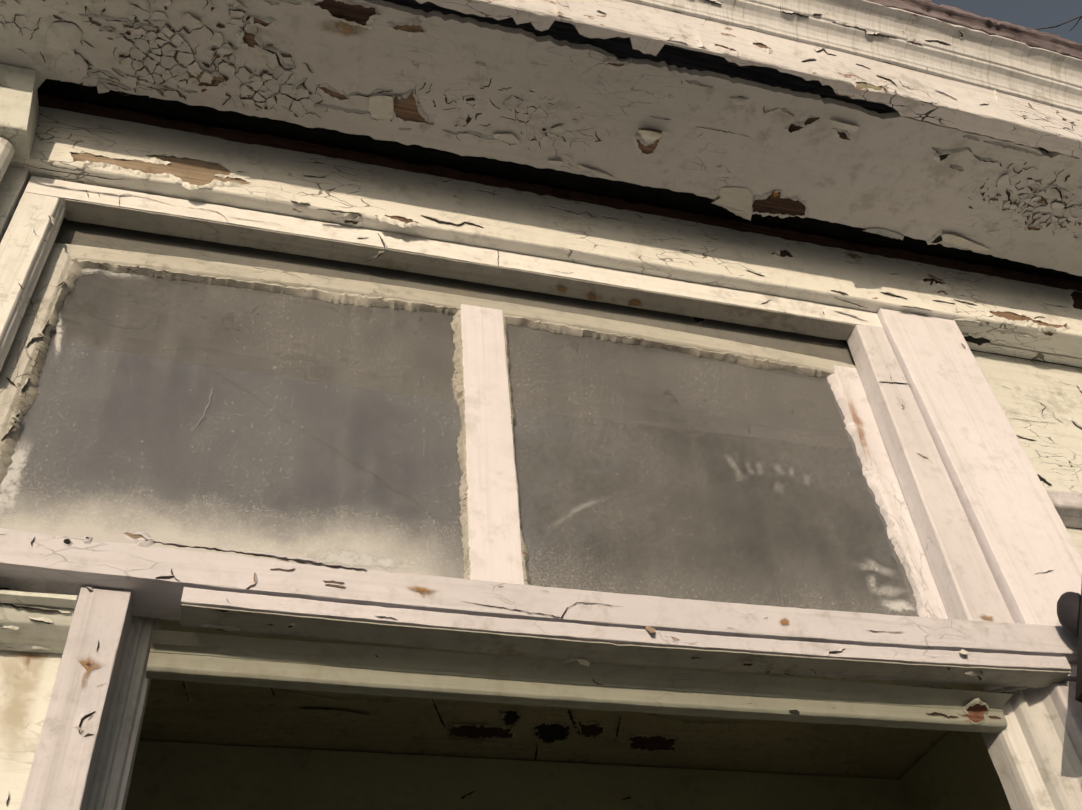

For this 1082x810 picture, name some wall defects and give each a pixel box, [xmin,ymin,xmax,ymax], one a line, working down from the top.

peeling [305,0,427,37]
peeling [711,43,739,57]
crack [0,0,622,159]
peeling [368,88,435,126]
peeling [65,151,252,190]
peeling [376,214,425,228]
peeling [712,187,809,221]
crack [932,135,1082,238]
peeling [942,234,989,251]
peeling [985,309,1070,338]
crack [989,381,1082,441]
crack [0,587,71,651]